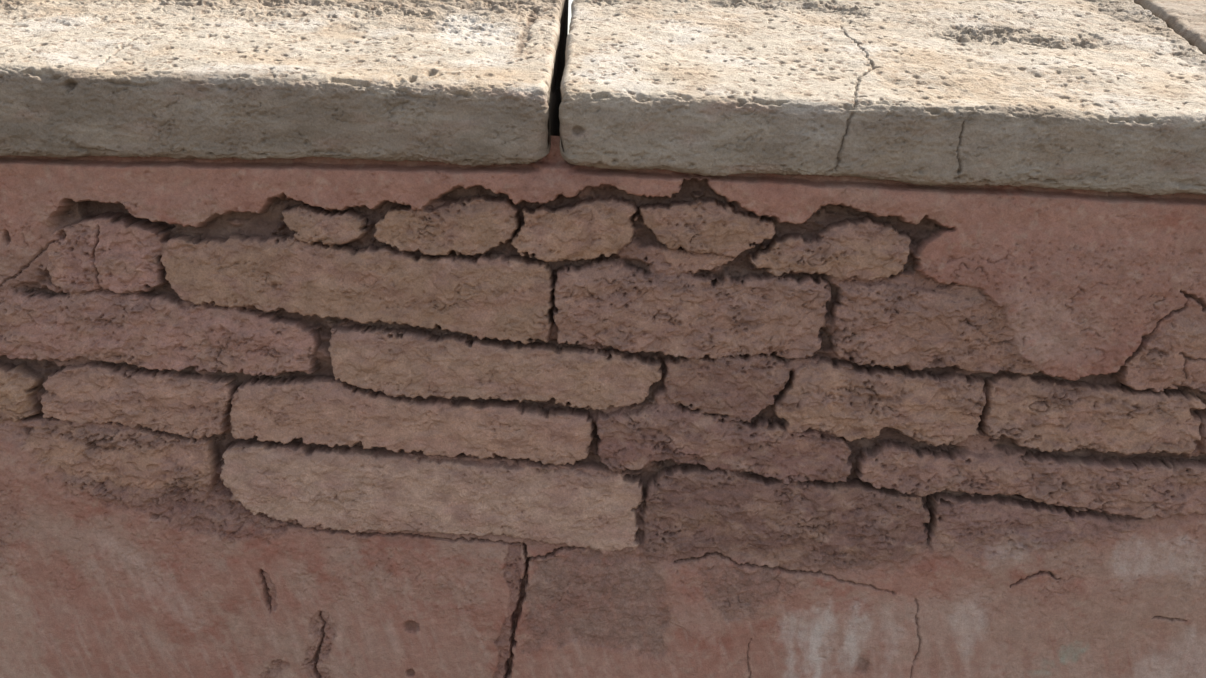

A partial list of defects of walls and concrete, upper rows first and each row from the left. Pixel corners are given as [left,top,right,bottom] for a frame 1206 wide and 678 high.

crack [840,25,866,52]
crack [834,111,857,173]
crack [956,129,966,181]
spalling [169,197,304,240]
spalling [332,185,524,251]
spalling [470,178,956,424]
spalling [847,365,1206,479]
spalling [91,410,322,545]
spalling [336,351,735,663]
crack [258,568,278,614]
crack [288,521,585,678]
crack [258,610,338,678]